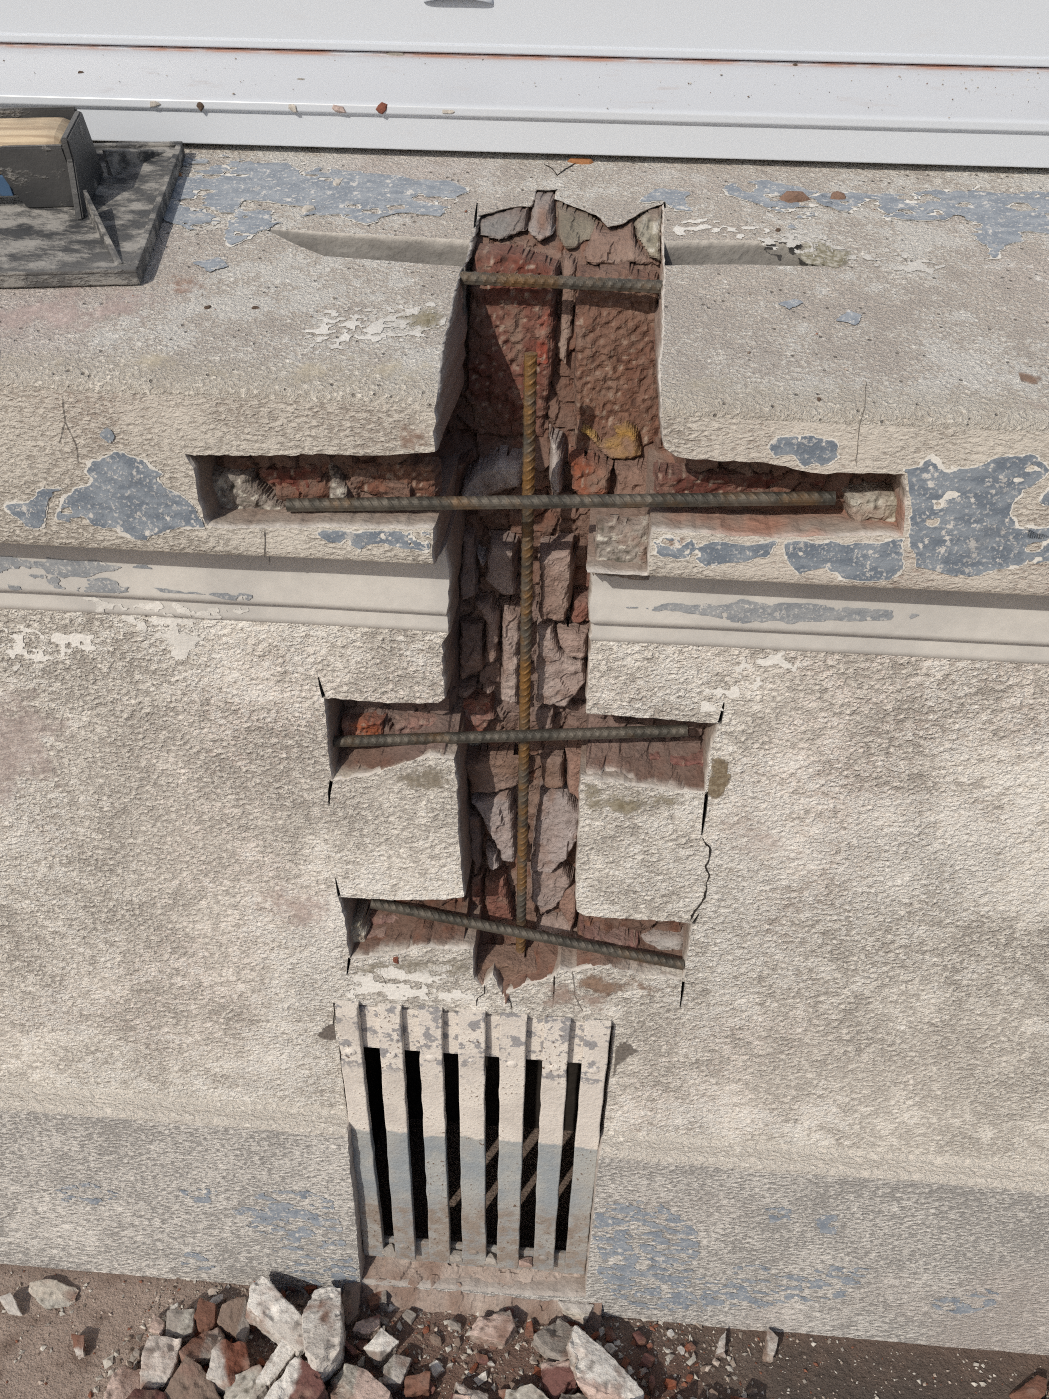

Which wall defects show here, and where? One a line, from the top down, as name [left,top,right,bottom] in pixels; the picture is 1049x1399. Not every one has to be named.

peeling [163,154,470,272]
spalling [0,179,1049,1011]
crack [690,838,711,920]
spalling [363,1047,385,1154]
spalling [404,1050,423,1119]
spalling [443,1053,460,1122]
spalling [485,1056,500,1126]
spalling [523,1059,542,1129]
spalling [563,1062,582,1132]